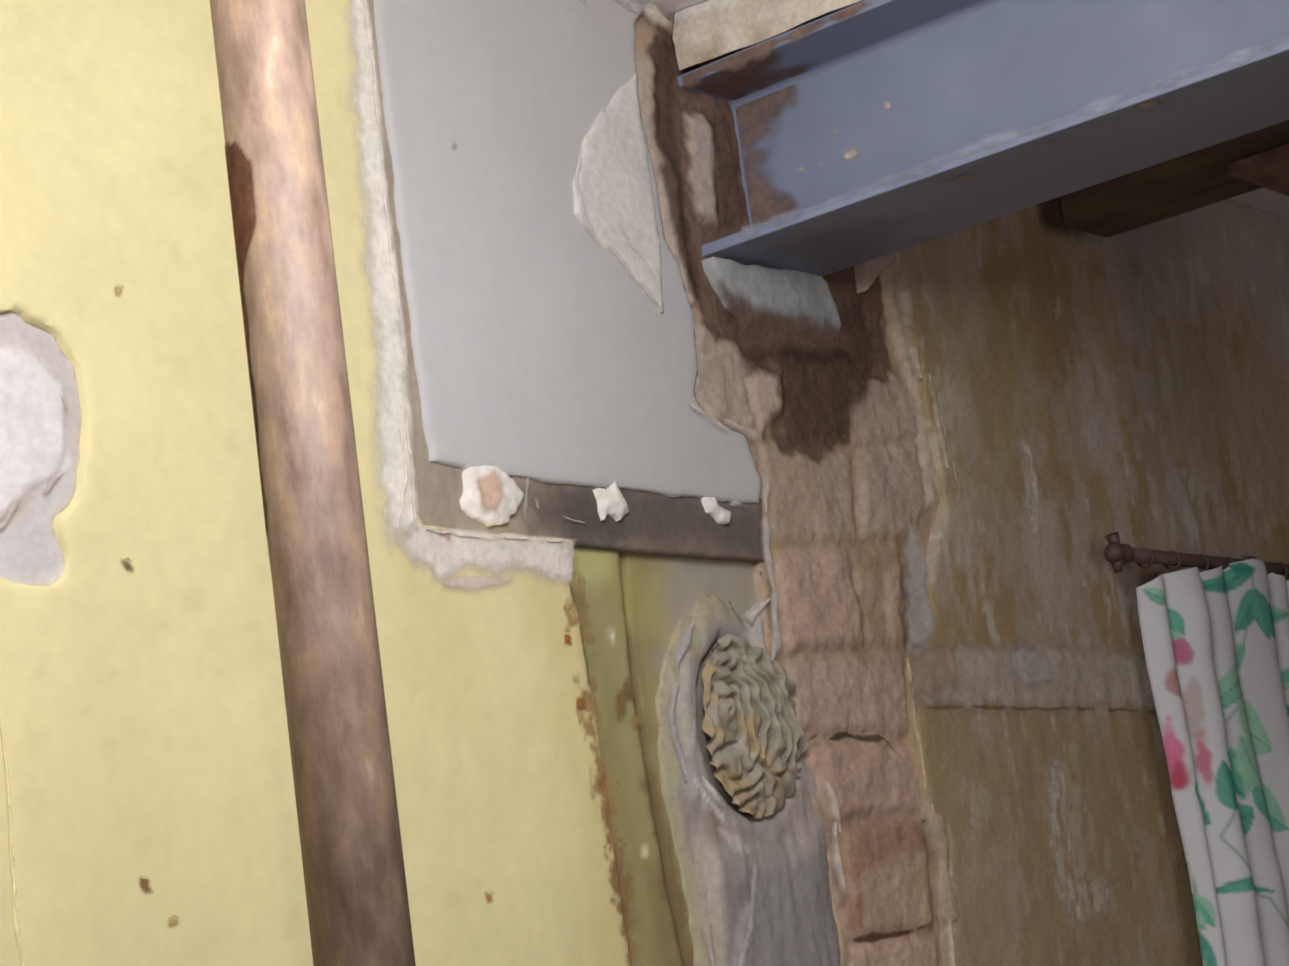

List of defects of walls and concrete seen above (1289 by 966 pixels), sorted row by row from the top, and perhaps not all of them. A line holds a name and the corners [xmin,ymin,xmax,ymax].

rust [682,2,865,226]
peeling [351,0,576,589]
peeling [0,311,82,586]
flaking render [635,0,1089,966]
crack [797,732,890,749]
crack [852,913,933,942]